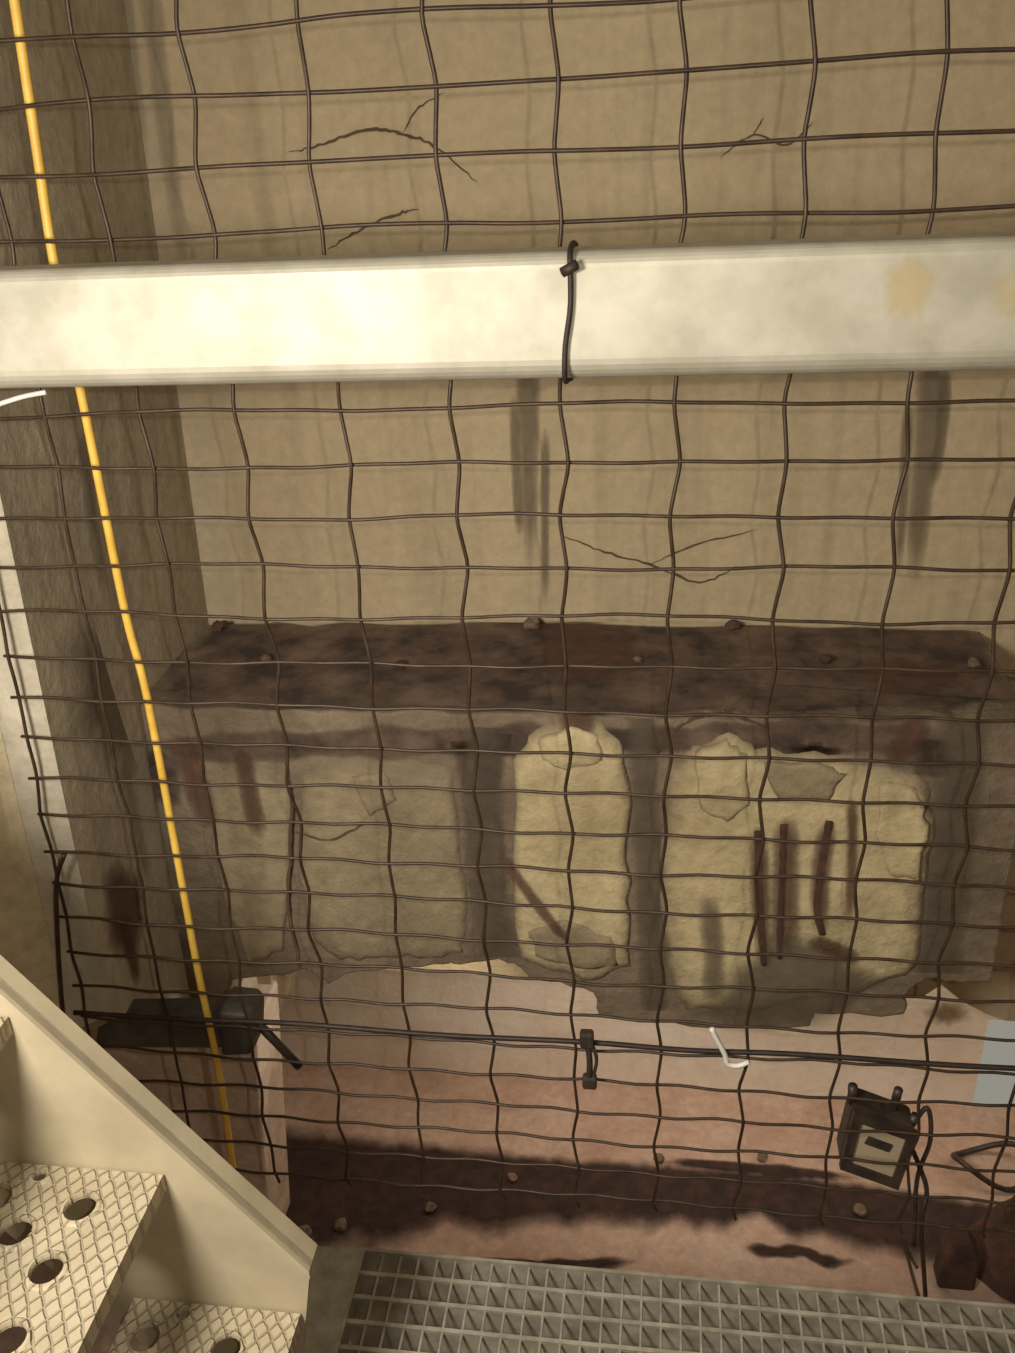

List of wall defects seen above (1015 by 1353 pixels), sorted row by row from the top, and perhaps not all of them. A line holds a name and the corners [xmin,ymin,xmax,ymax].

crack [288,92,477,182]
crack [327,209,418,250]
water stain [512,378,548,576]
water stain [899,371,948,550]
crack [564,529,758,584]
rust [751,826,796,952]
rust [811,828,855,961]
rust [846,804,856,910]